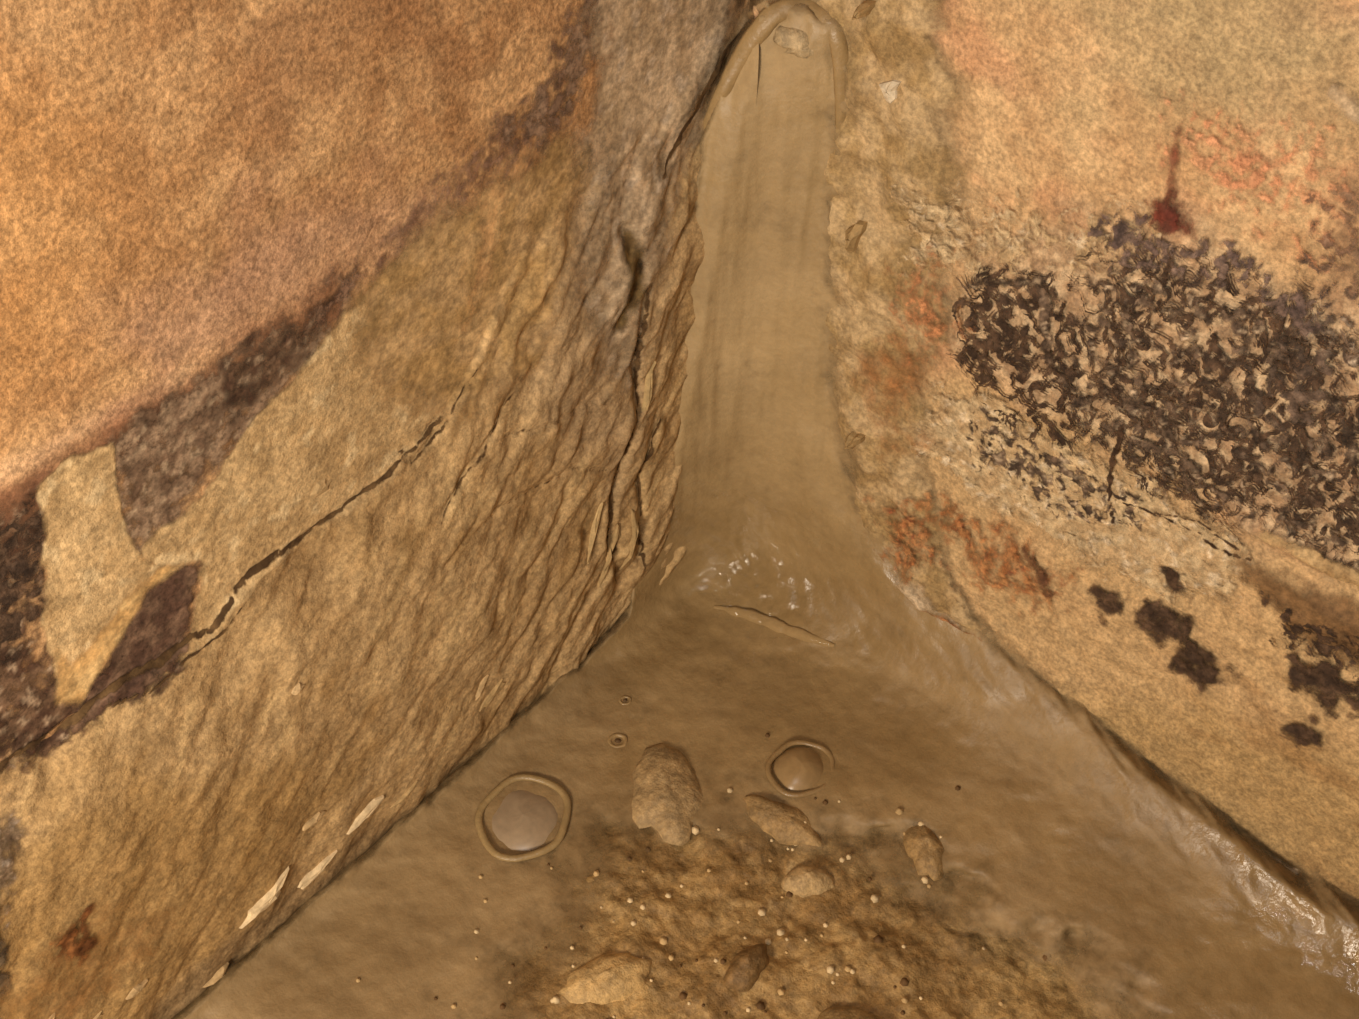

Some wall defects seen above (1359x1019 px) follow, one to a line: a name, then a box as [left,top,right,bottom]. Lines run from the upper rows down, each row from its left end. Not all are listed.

rust [1151,127,1191,235]
crack [0,370,477,774]
water stain [890,183,1359,748]